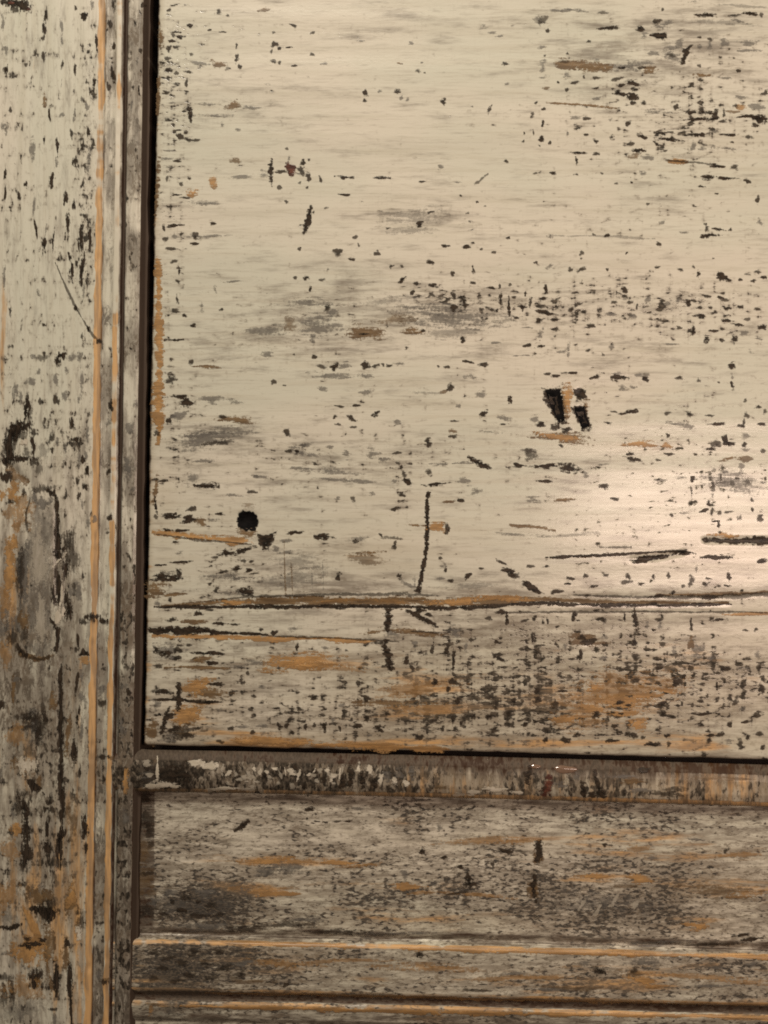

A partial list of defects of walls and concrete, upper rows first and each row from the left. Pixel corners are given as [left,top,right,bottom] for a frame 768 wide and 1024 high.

peeling [540,8,763,113]
spalling [572,90,768,187]
spalling [450,265,573,356]
spalling [665,294,767,344]
spalling [12,352,84,415]
spalling [49,417,112,534]
spalling [513,372,649,483]
peeling [621,411,693,462]
spalling [706,399,766,469]
peeling [141,607,765,838]
peeling [0,756,55,873]
peeling [0,876,84,1024]